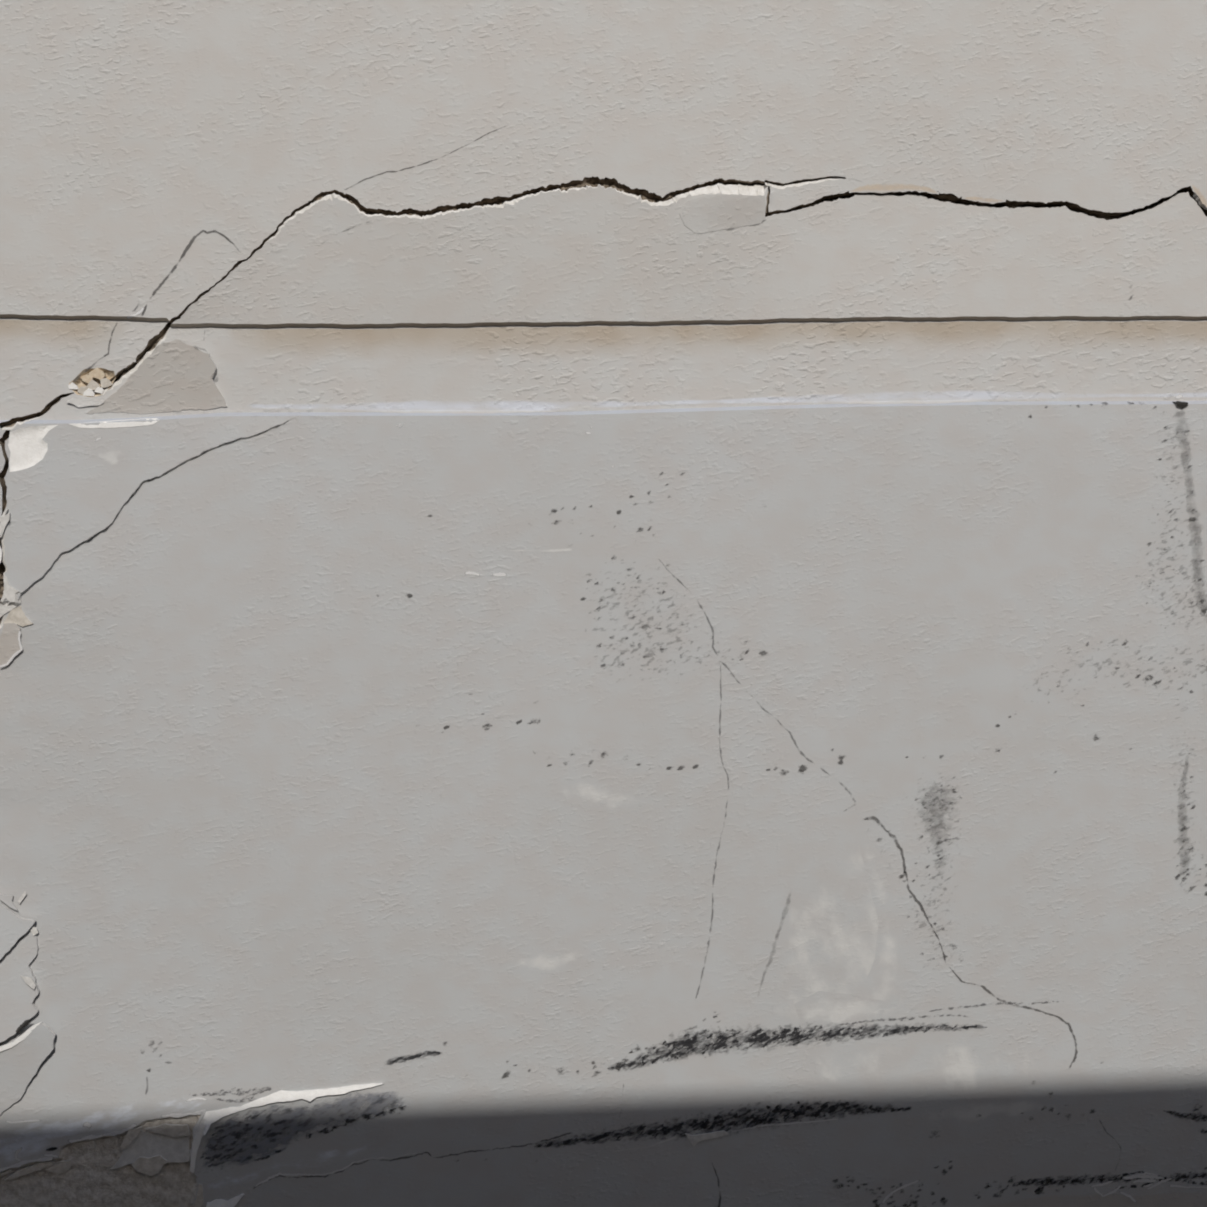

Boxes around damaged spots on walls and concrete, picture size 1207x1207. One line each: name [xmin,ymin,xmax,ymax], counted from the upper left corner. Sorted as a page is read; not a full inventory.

peeling [8,425,57,472]
spalling [67,368,116,408]
crack [0,129,1207,629]
spalling [0,509,34,668]
peeling [0,891,56,1115]
water stain [611,1003,986,1069]
crack [866,816,1077,1067]
spalling [0,1083,404,1207]
water stain [537,1101,910,1147]